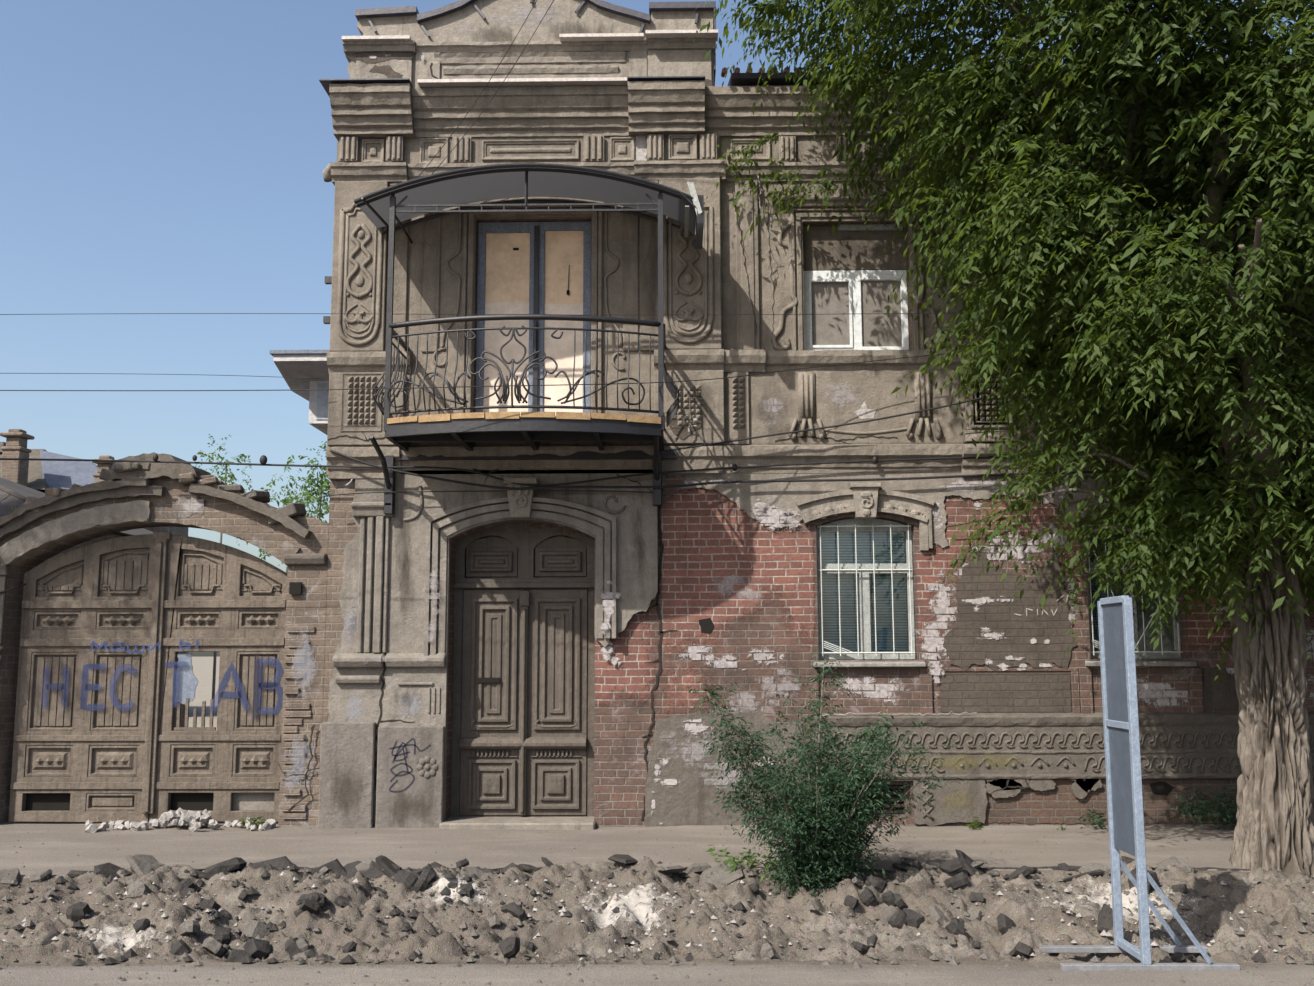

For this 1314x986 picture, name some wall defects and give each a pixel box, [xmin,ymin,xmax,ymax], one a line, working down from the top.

crack [375,662,413,820]
crack [616,474,678,820]
spalling [595,488,815,827]
peeling [916,495,1083,712]
spalling [985,778,1108,825]
spalling [1142,779,1237,826]